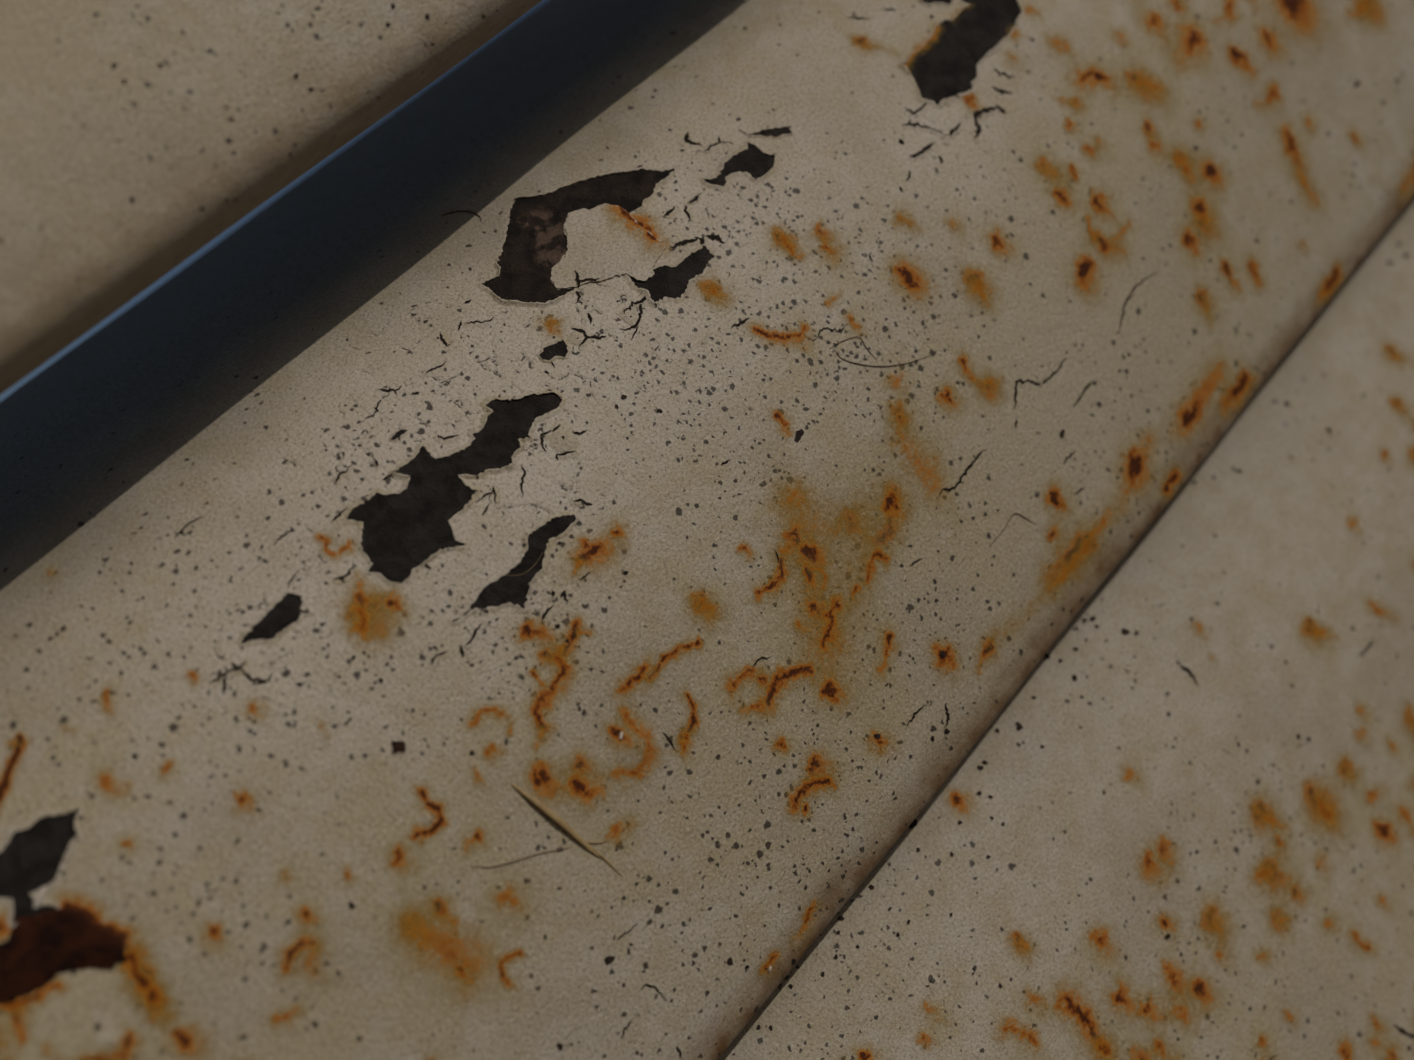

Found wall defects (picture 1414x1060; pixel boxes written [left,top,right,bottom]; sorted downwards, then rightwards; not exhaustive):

peeling [898,0,1025,110]
peeling [475,163,718,309]
rust [1034,138,1131,294]
peeling [340,388,567,588]
peeling [236,589,318,648]
peeling [446,511,580,627]
rust [725,481,909,716]
rust [0,733,28,806]
rust [519,590,718,805]
peeling [0,805,128,1004]
rust [59,894,205,1060]
rust [1027,989,1112,1060]